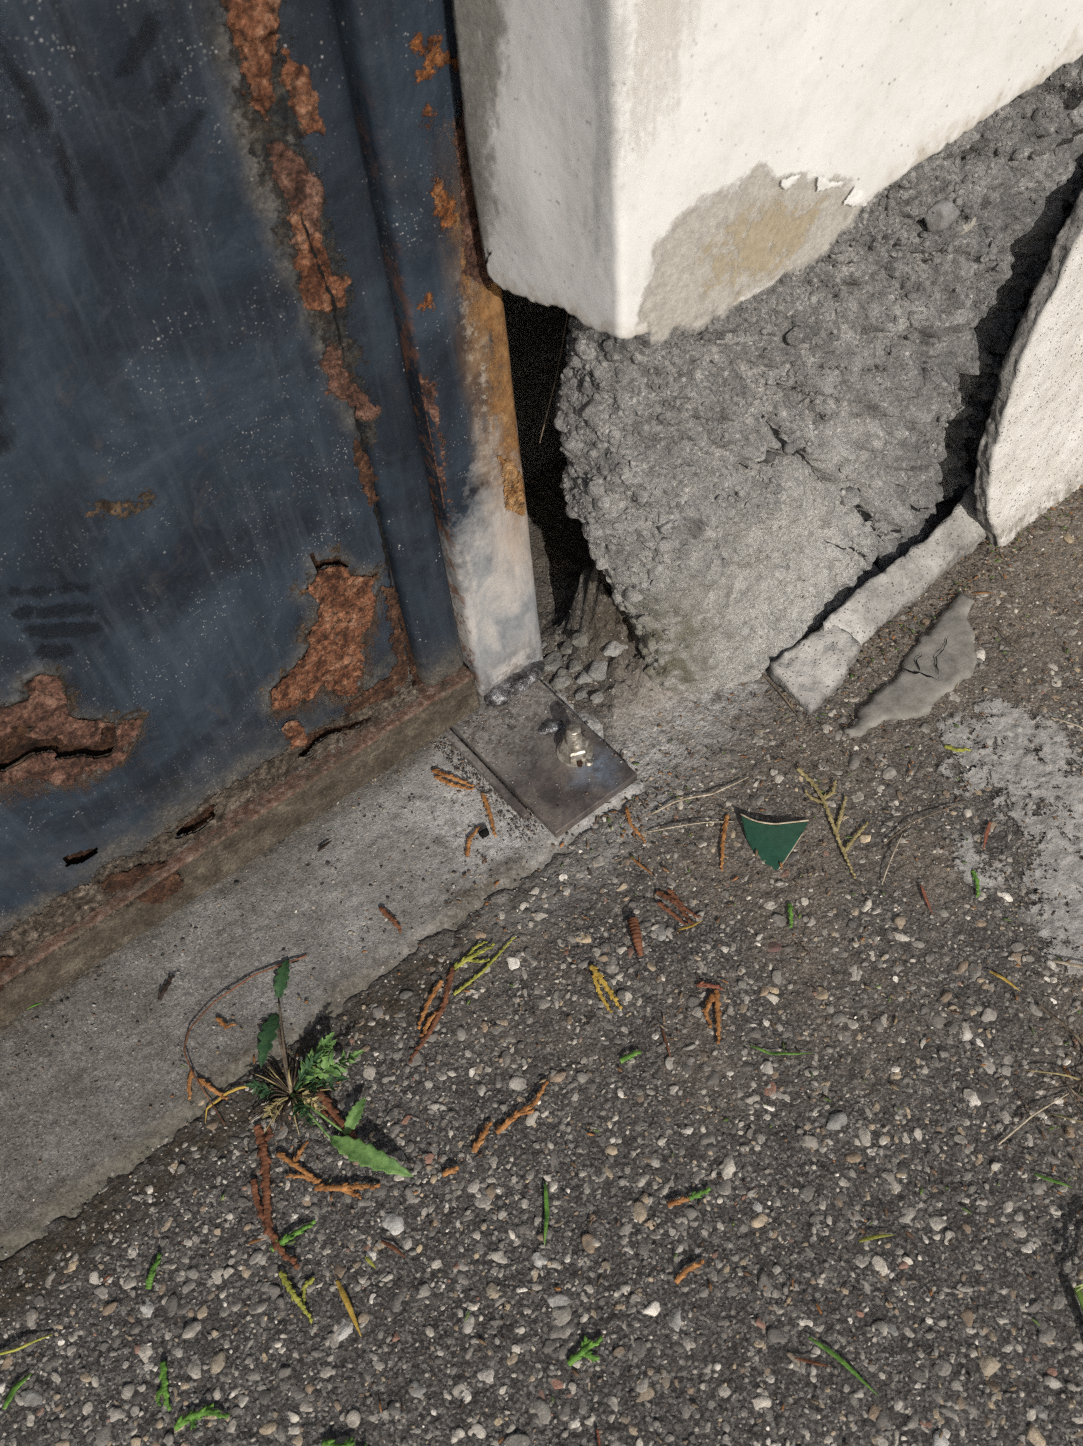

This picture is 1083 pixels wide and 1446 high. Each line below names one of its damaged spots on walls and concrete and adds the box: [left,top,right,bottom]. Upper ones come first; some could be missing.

corrosion [80,488,155,522]
corrosion [211,0,381,506]
corrosion [409,31,459,84]
corrosion [430,99,526,516]
spalling [554,55,1083,694]
corrosion [0,543,419,993]